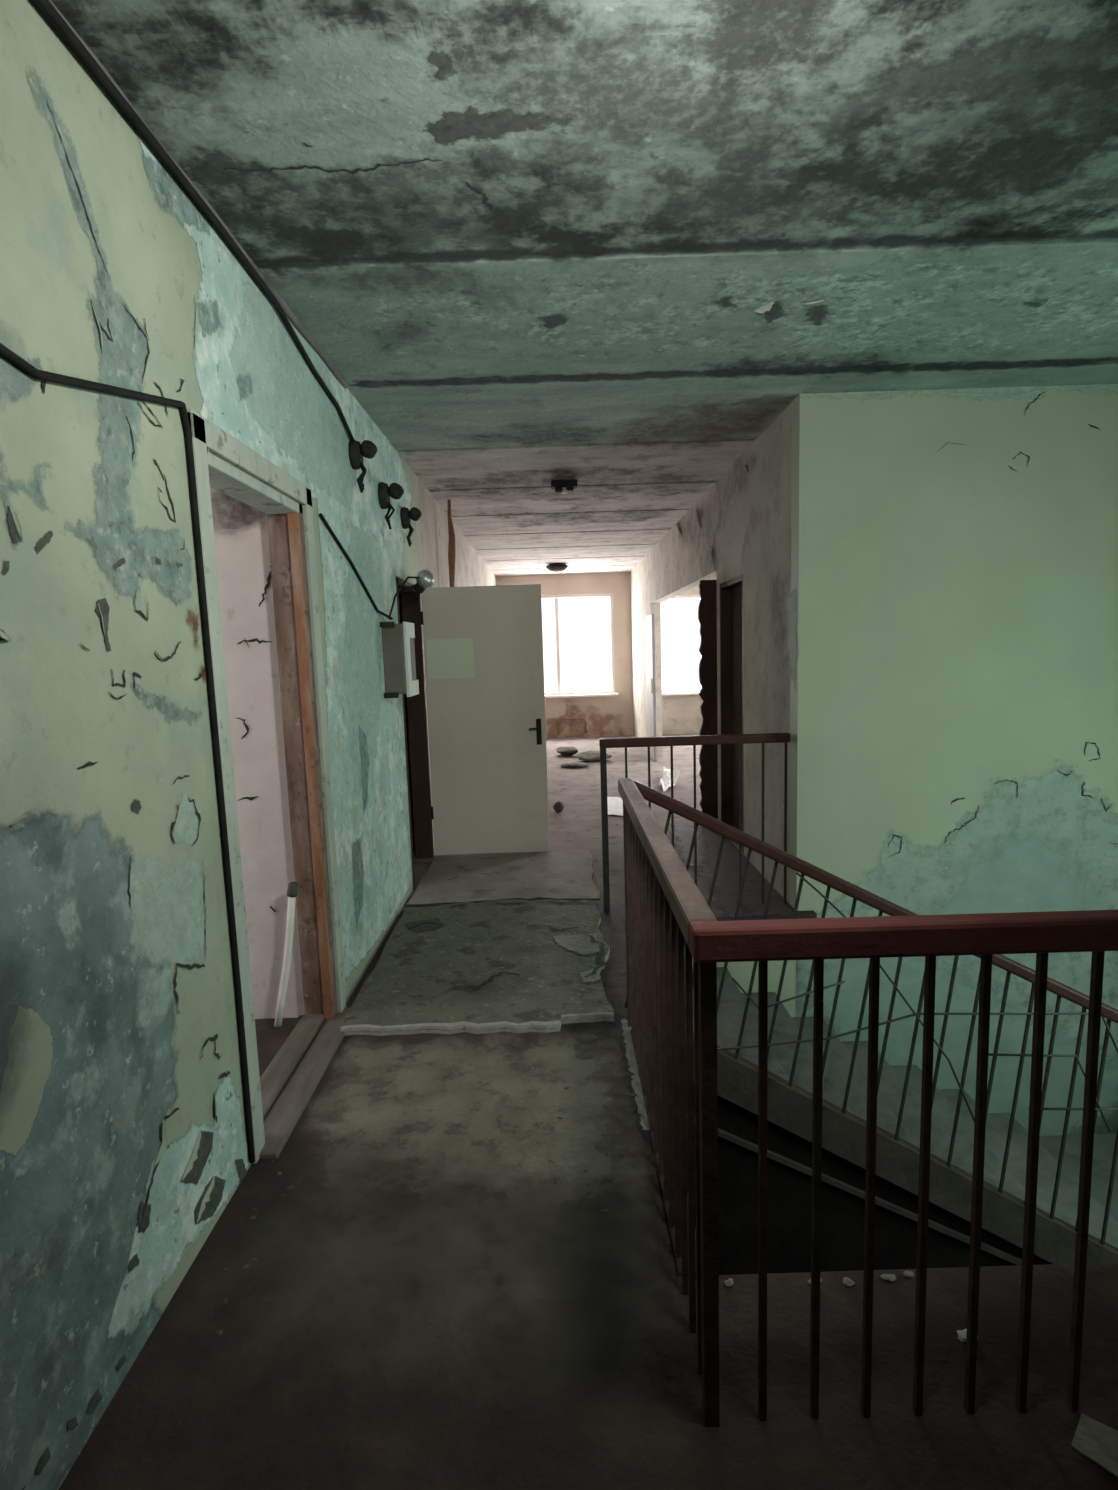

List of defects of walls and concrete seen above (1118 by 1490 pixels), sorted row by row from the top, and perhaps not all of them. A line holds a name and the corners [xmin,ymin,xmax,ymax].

damp [54,3,261,110]
damp [179,0,1118,269]
peeling [0,75,201,724]
peeling [817,767,1118,918]
peeling [0,797,248,1490]
peeling [796,951,1118,1136]